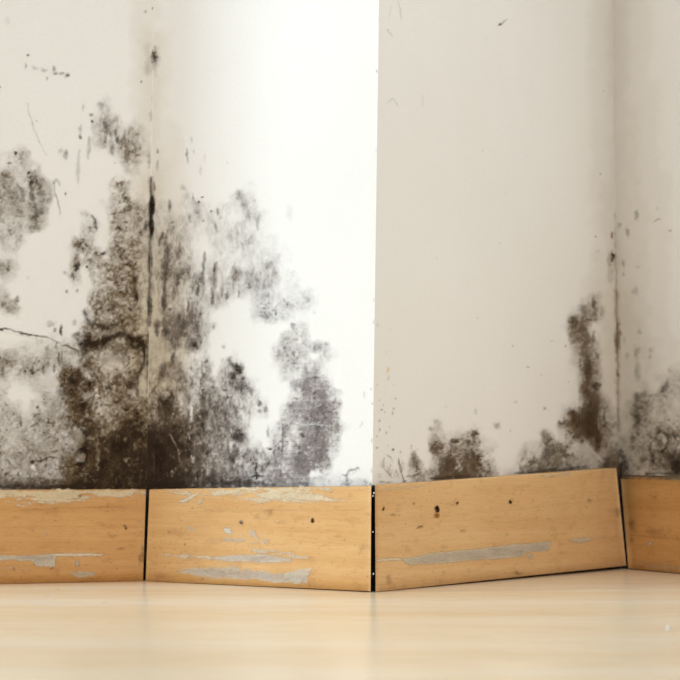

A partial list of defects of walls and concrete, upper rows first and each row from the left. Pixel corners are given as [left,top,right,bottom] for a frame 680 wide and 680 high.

damp [104,122,140,156]
damp [0,172,23,217]
damp [27,172,49,229]
damp [0,182,340,493]
damp [522,301,633,480]
damp [413,431,491,481]
damp [631,394,680,480]
peeling [46,553,103,577]
peeling [180,566,311,584]